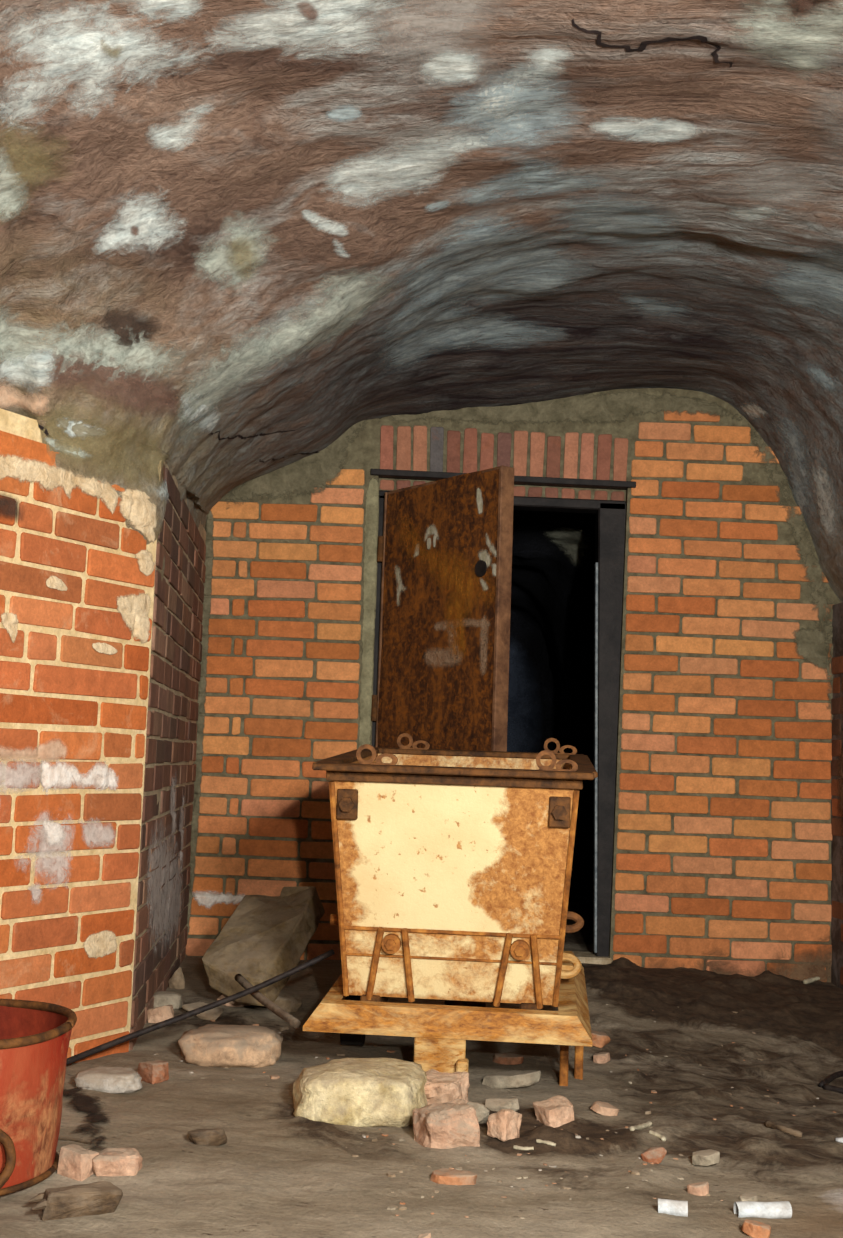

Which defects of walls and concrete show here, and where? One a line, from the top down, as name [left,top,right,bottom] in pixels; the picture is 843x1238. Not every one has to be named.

crack [572,18,733,68]
water stain [594,120,692,141]
water stain [303,210,347,256]
water stain [521,165,681,252]
water stain [731,208,774,220]
water stain [623,296,686,313]
water stain [53,357,177,412]
water stain [809,367,835,389]
water stain [40,414,162,474]
water stain [779,420,836,537]
water stain [0,760,118,792]
water stain [22,813,70,900]